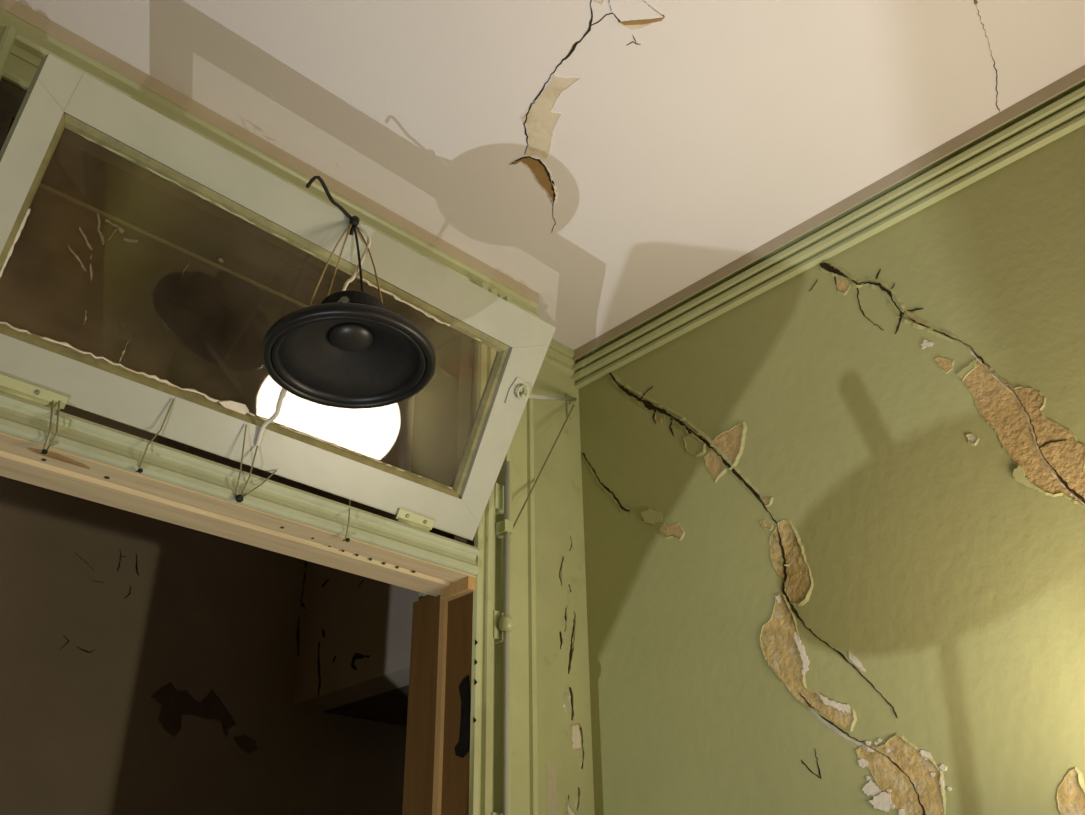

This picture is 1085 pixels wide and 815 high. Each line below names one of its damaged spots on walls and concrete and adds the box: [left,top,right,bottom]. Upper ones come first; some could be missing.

peeling [508,74,581,204]
crack [510,0,641,231]
peeling [592,0,665,30]
crack [975,4,1000,112]
crack [809,260,1085,506]
peeling [903,312,1085,510]
crack [581,453,630,515]
crack [608,372,898,719]
peeling [759,496,857,732]
crack [800,694,926,815]
peeling [854,732,951,815]
peeling [1055,766,1085,815]